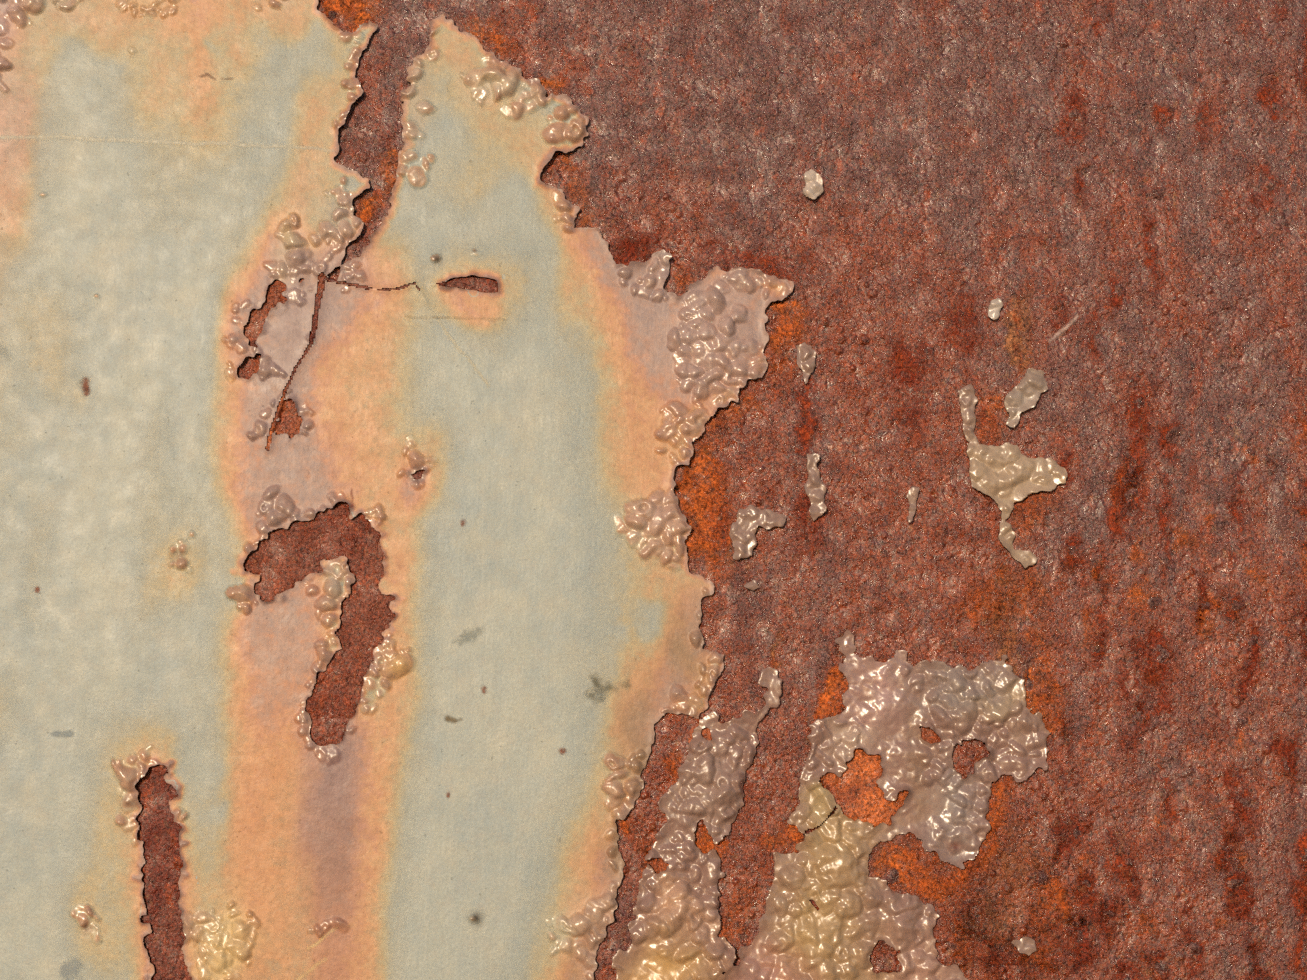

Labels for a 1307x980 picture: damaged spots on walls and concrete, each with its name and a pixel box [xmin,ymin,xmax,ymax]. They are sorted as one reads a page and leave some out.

crack [286,277,420,386]
rust [833,686,846,714]
rust [920,726,990,779]
rust [819,748,909,827]
rust [545,756,625,919]
rust [593,713,697,980]
rust [694,819,708,840]
rust [868,832,962,886]
rust [869,940,902,974]